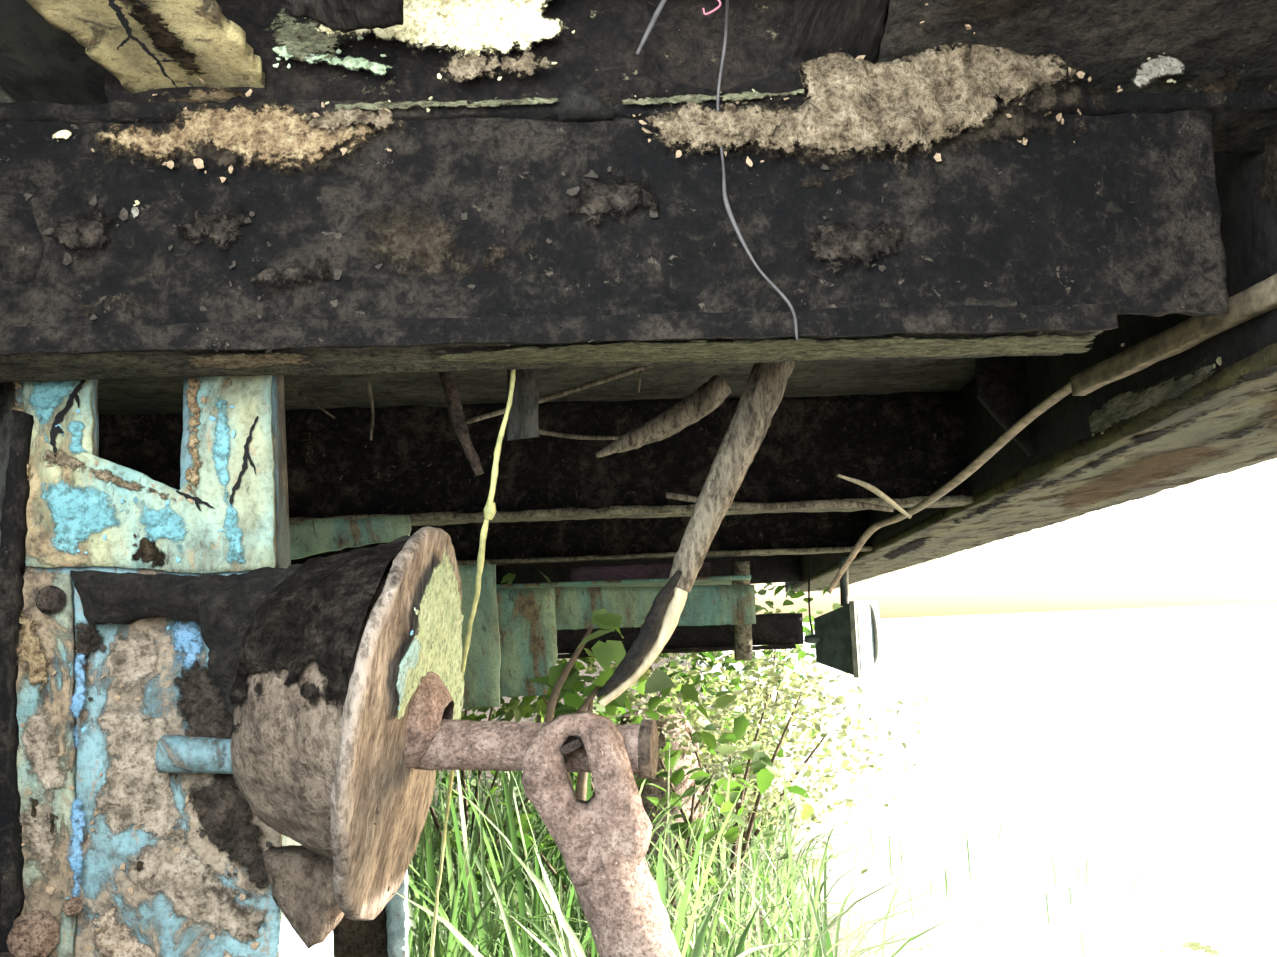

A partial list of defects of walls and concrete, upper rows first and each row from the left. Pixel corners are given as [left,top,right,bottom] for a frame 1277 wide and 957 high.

crack [108,0,181,91]
peeling [264,0,575,83]
peeling [325,96,558,112]
peeling [28,381,87,454]
crack [50,380,86,457]
peeling [41,480,186,563]
crack [176,416,259,511]
peeling [209,398,246,563]
peeling [167,621,203,669]
spalling [29,797,58,833]